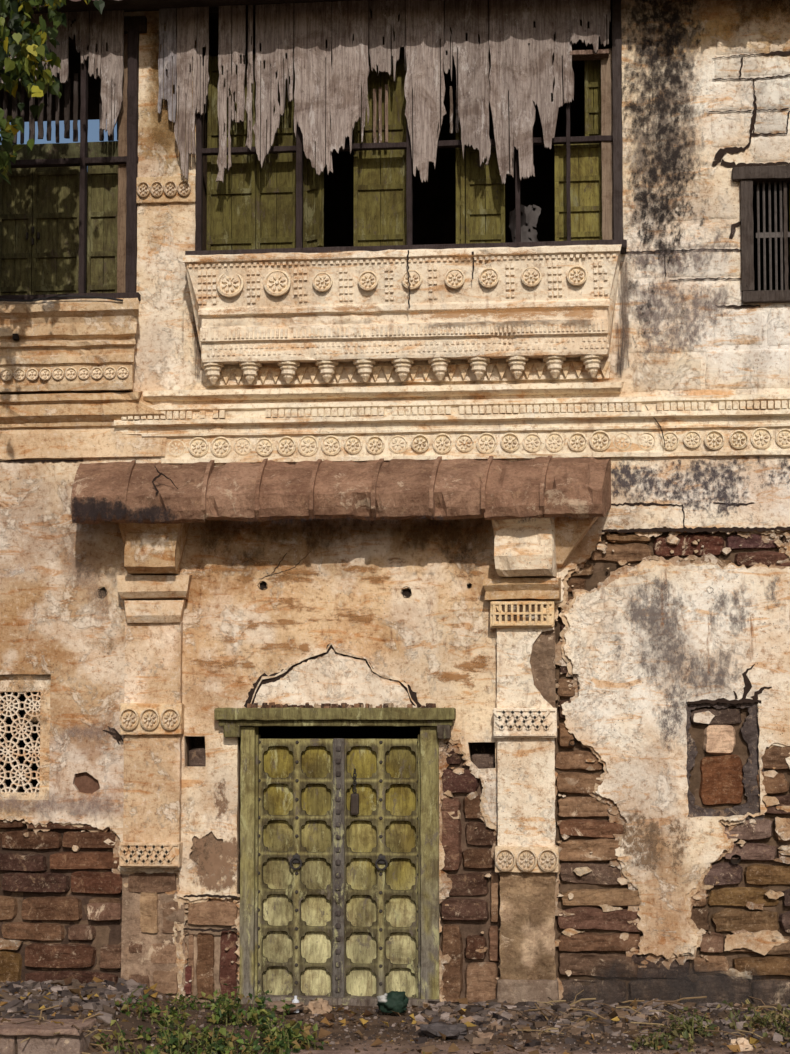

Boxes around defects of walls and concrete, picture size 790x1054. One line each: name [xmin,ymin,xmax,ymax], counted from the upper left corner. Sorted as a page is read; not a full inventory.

crack [709,51,790,167]
water stain [615,0,734,373]
crack [152,466,178,496]
water stain [611,459,750,516]
water stain [625,579,737,748]
water stain [710,592,749,635]
spalling [74,772,100,794]
flaking render [530,527,790,1007]
flaking render [439,738,501,1003]